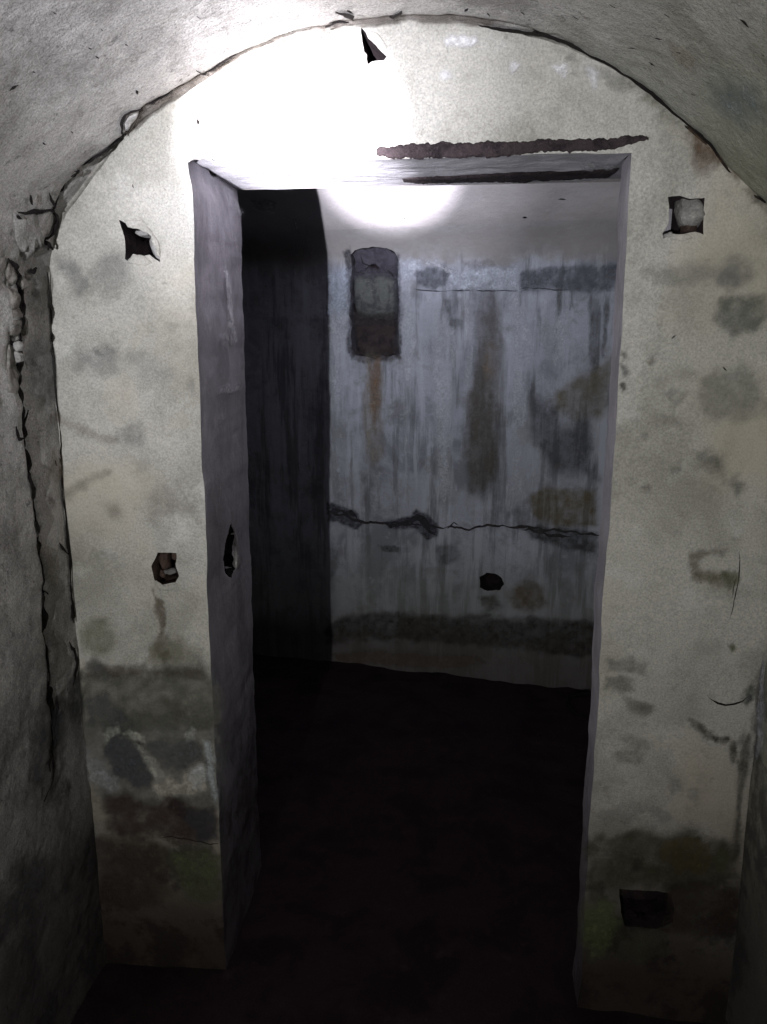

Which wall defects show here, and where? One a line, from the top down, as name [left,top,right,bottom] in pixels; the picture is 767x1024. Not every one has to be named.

hole [361,28,388,64]
crack [477,24,731,173]
corrosion [376,135,649,160]
hole [663,196,705,242]
hole [119,220,161,266]
damp [402,260,617,300]
crack [7,54,236,802]
damp [386,510,437,539]
crack [328,510,599,538]
hole [152,553,179,591]
damp [327,614,594,664]
damp [51,667,219,840]